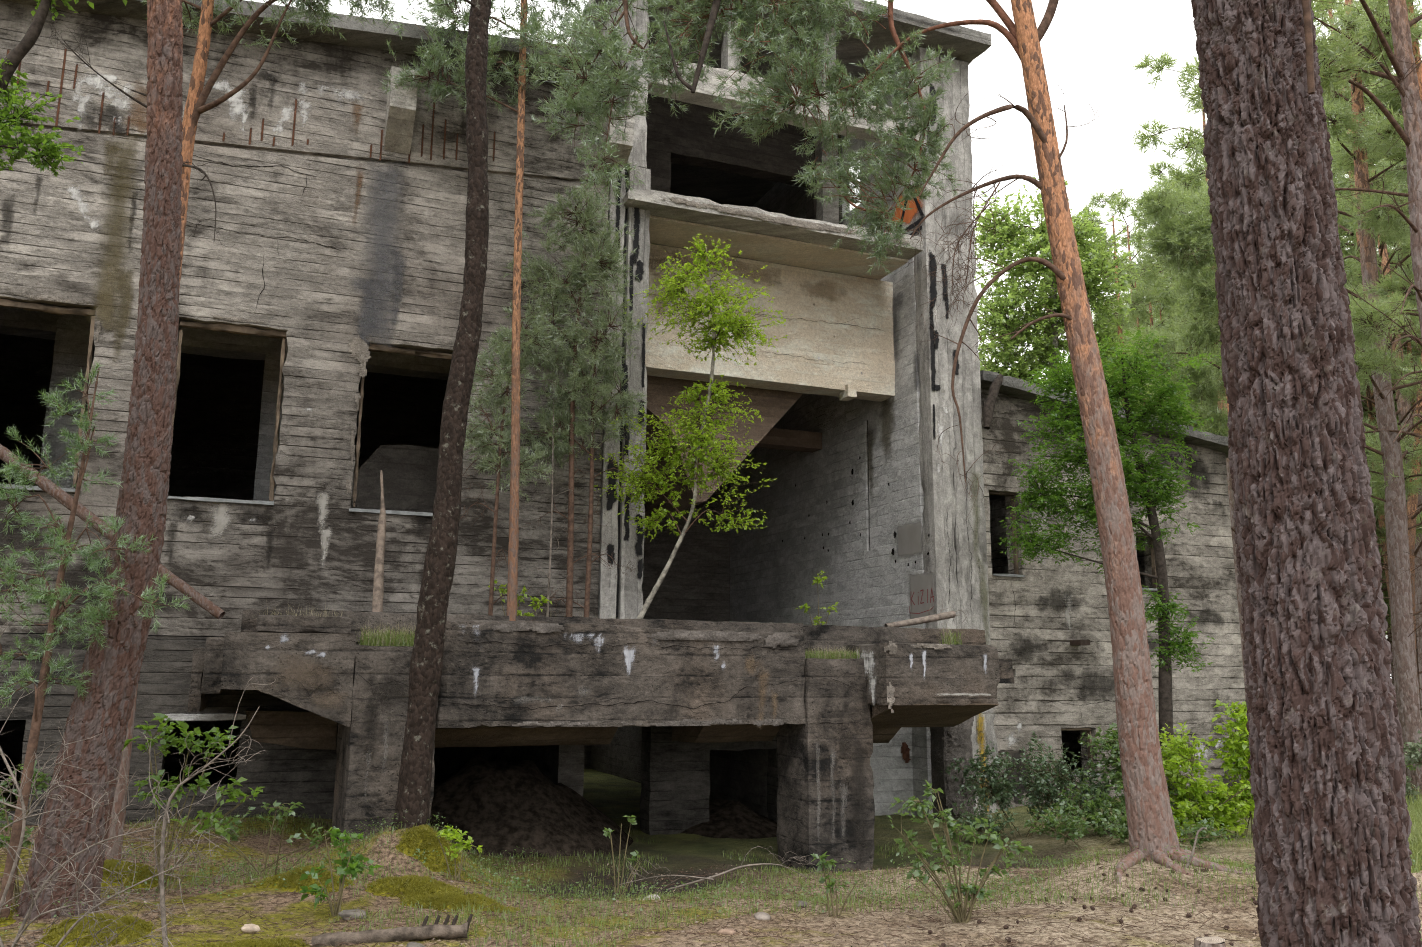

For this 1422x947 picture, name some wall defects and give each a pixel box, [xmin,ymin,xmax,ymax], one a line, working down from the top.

corrosion [46,49,78,127]
corrosion [98,92,130,136]
corrosion [248,99,309,146]
corrosion [408,98,458,163]
leakage [68,142,136,351]
leakage [606,171,646,579]
leakage [892,294,902,354]
leakage [914,250,959,439]
leakage [318,494,331,560]